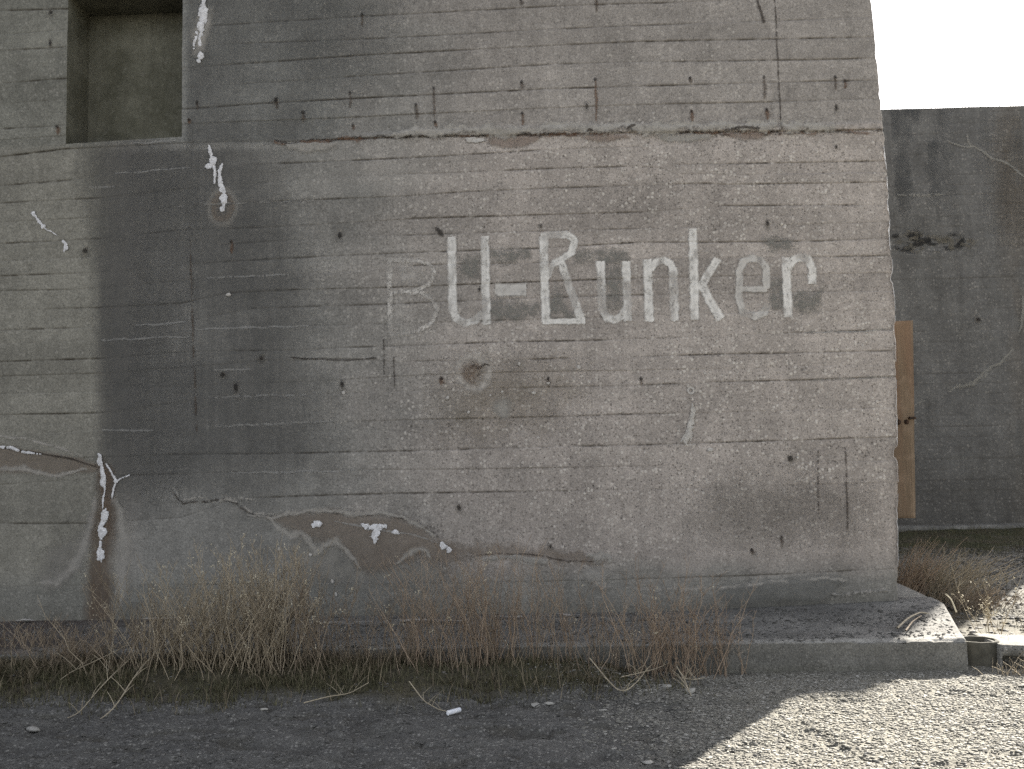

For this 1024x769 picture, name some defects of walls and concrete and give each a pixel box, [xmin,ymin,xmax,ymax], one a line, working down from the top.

leakage [192,0,211,63]
crack [274,119,884,145]
leakage [31,211,68,252]
leakage [184,145,262,302]
leakage [40,149,155,618]
crack [173,488,274,517]